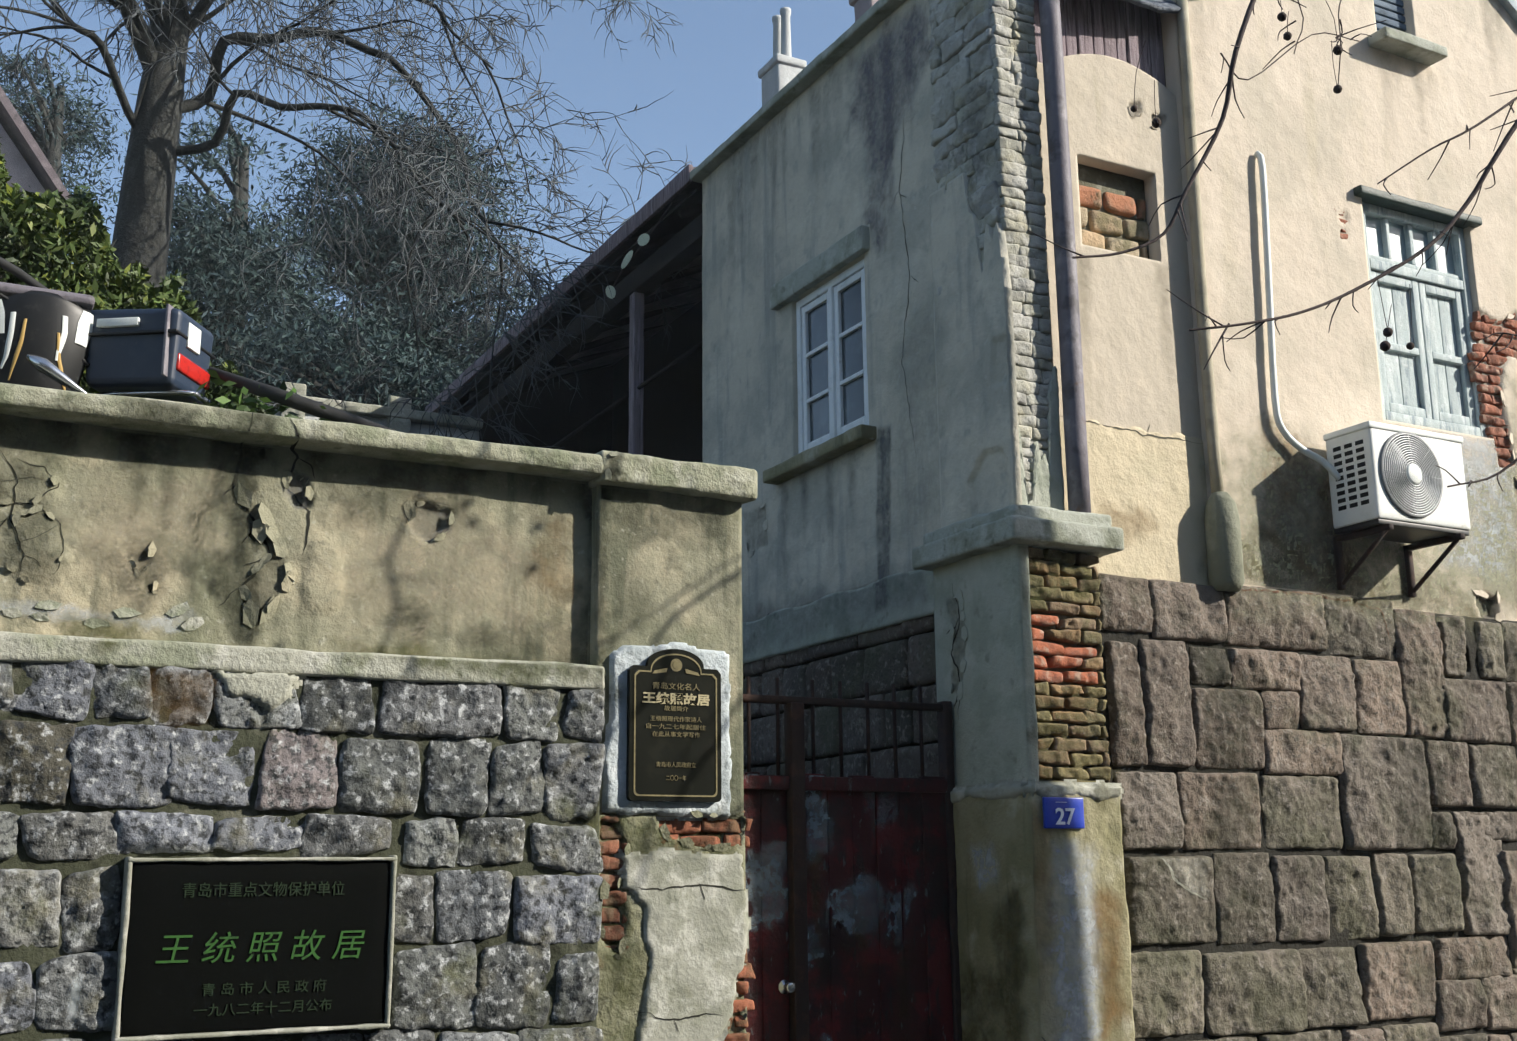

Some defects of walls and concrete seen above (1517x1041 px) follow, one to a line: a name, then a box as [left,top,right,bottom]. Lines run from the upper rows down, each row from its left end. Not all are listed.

damp [852,8,928,248]
crack [894,111,917,452]
flaking render [1467,311,1517,504]
crack [0,453,41,581]
flaking render [233,480,298,629]
crack [219,414,315,606]
flaking render [282,471,314,504]
flaking render [403,500,455,542]
spalling [1031,614,1098,686]
flaking render [591,812,631,960]
flaking render [659,810,788,929]
flaking render [715,949,756,1041]